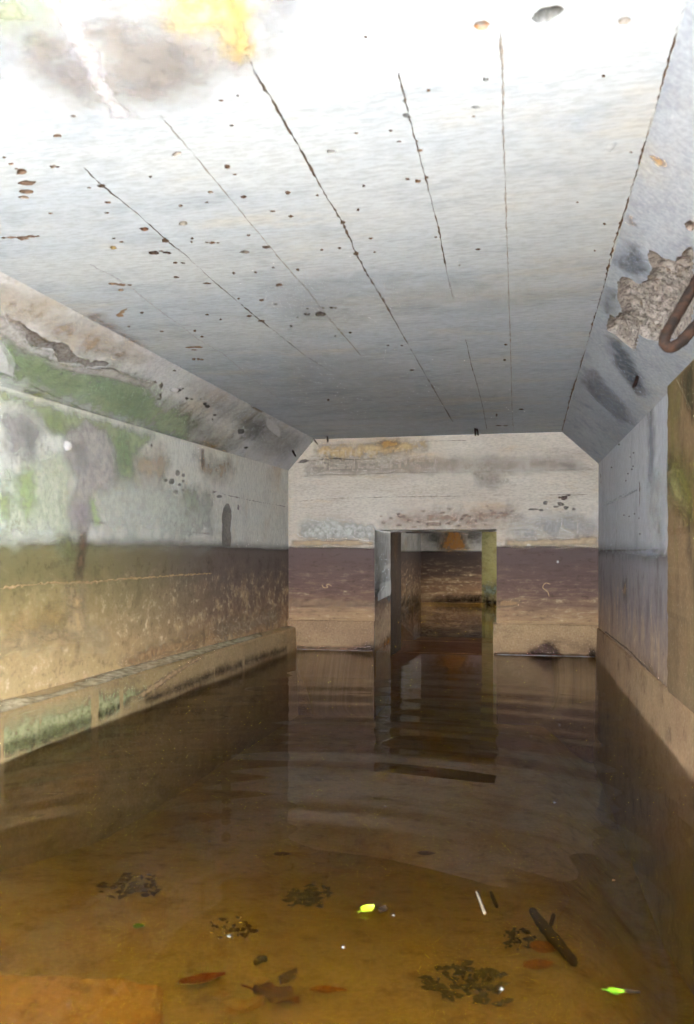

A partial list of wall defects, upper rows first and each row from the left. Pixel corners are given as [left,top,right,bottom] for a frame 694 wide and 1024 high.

leakage [24,2,243,117]
peeling [6,314,109,375]
leakage [0,317,152,388]
crack [87,170,334,374]
crack [161,116,359,353]
crack [229,24,453,422]
crack [562,8,685,430]
spalling [606,245,694,350]
leakage [0,414,668,703]